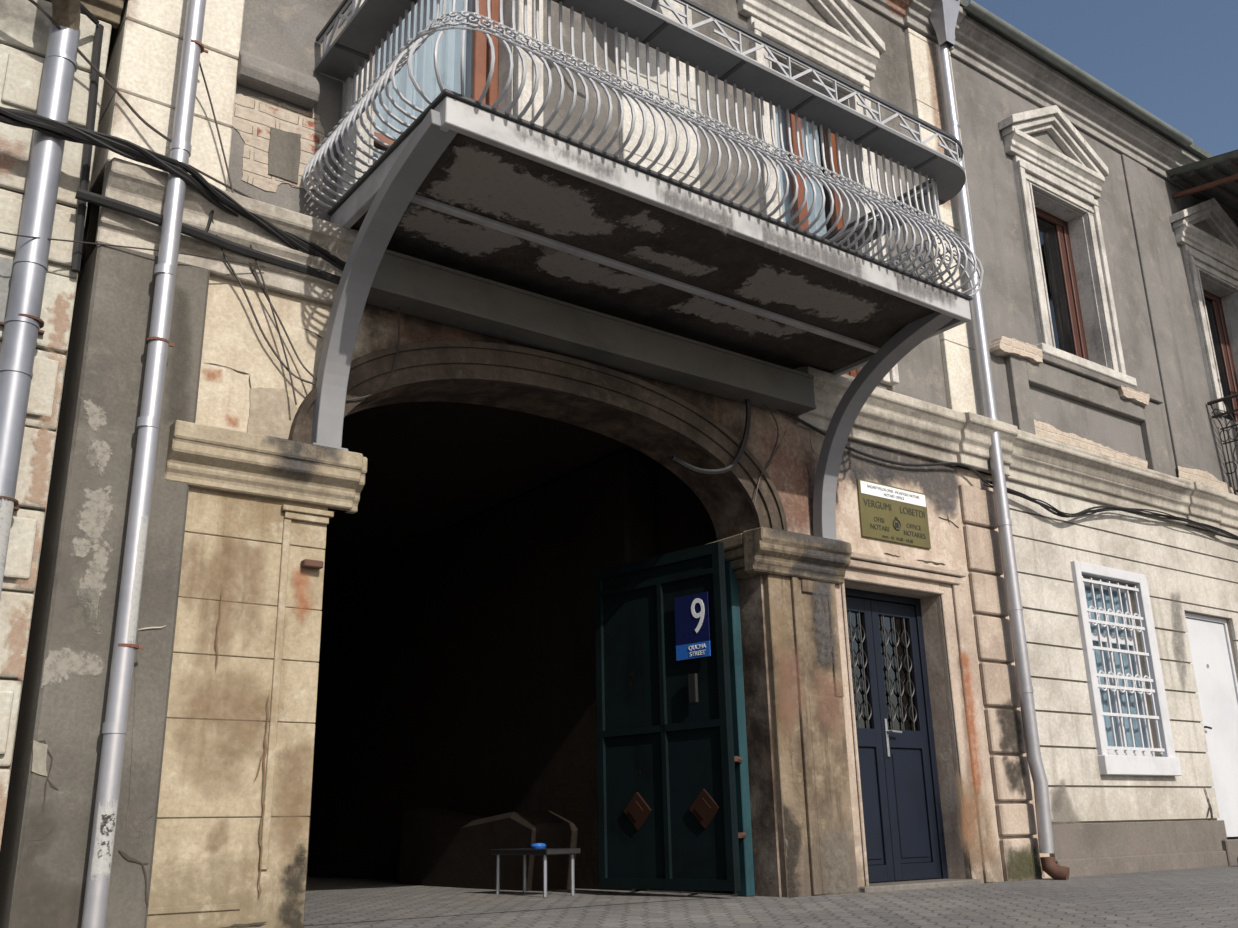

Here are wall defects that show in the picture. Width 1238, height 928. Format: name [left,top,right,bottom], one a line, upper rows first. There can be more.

flaking render [233,93,325,195]
peeling [0,294,75,596]
flaking render [84,400,112,472]
water stain [269,436,339,481]
flaking render [72,486,113,634]
peeling [1,606,31,680]
flaking render [41,647,104,687]
rust [962,655,981,839]
water stain [280,843,307,928]